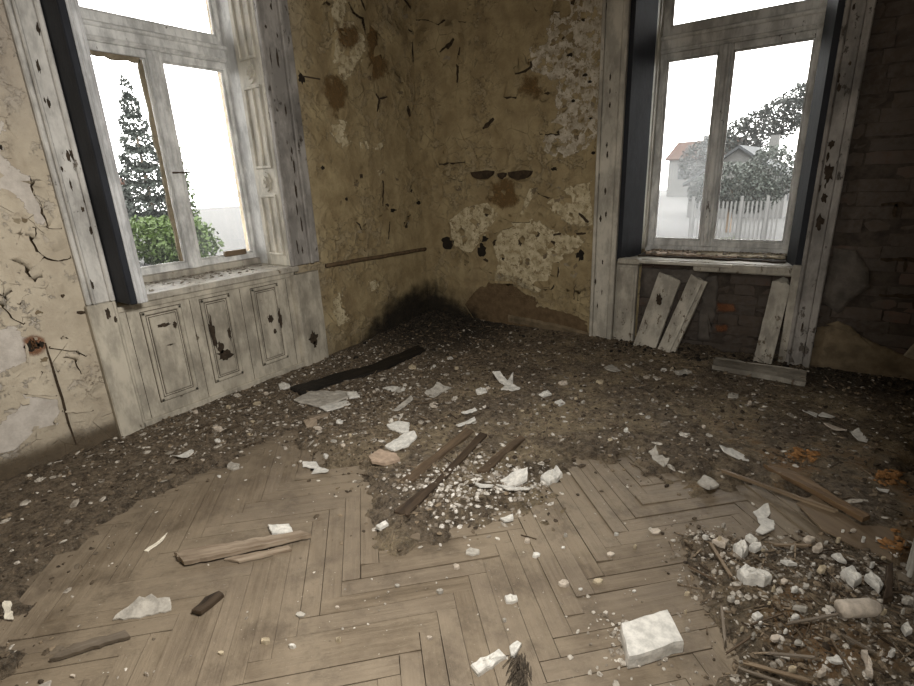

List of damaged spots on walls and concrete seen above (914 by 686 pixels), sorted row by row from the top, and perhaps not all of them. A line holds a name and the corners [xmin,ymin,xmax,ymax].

damp [337,23,387,80]
damp [324,75,347,118]
flaking render [529,0,611,171]
flaking render [0,114,62,242]
flaking render [441,174,607,335]
damp [365,284,477,340]
flaking render [0,326,48,373]
flaking render [0,394,63,457]